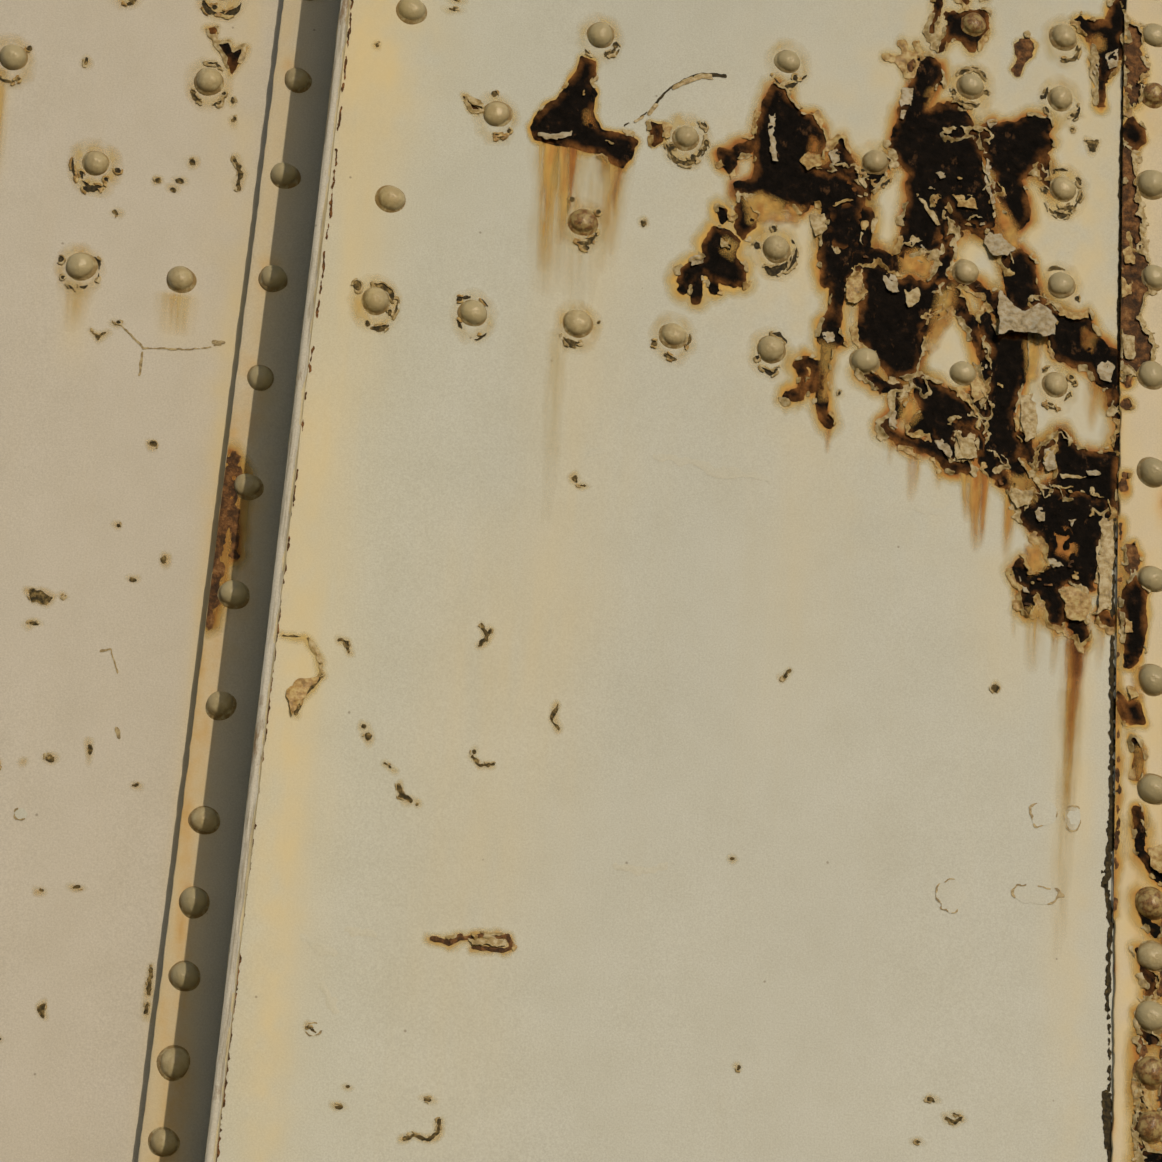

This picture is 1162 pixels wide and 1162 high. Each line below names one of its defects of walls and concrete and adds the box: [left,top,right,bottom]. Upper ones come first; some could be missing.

peeling [881,40,926,79]
corrosion [527,55,673,236]
peeling [664,116,711,169]
peeling [1067,103,1099,152]
peeling [1041,167,1085,220]
peeling [752,225,799,277]
crack [121,325,225,376]
peeling [650,334,692,362]
peeling [1041,373,1078,412]
corrosion [205,445,253,630]
corrosion [667,0,1162,1162]
peeling [281,634,326,715]